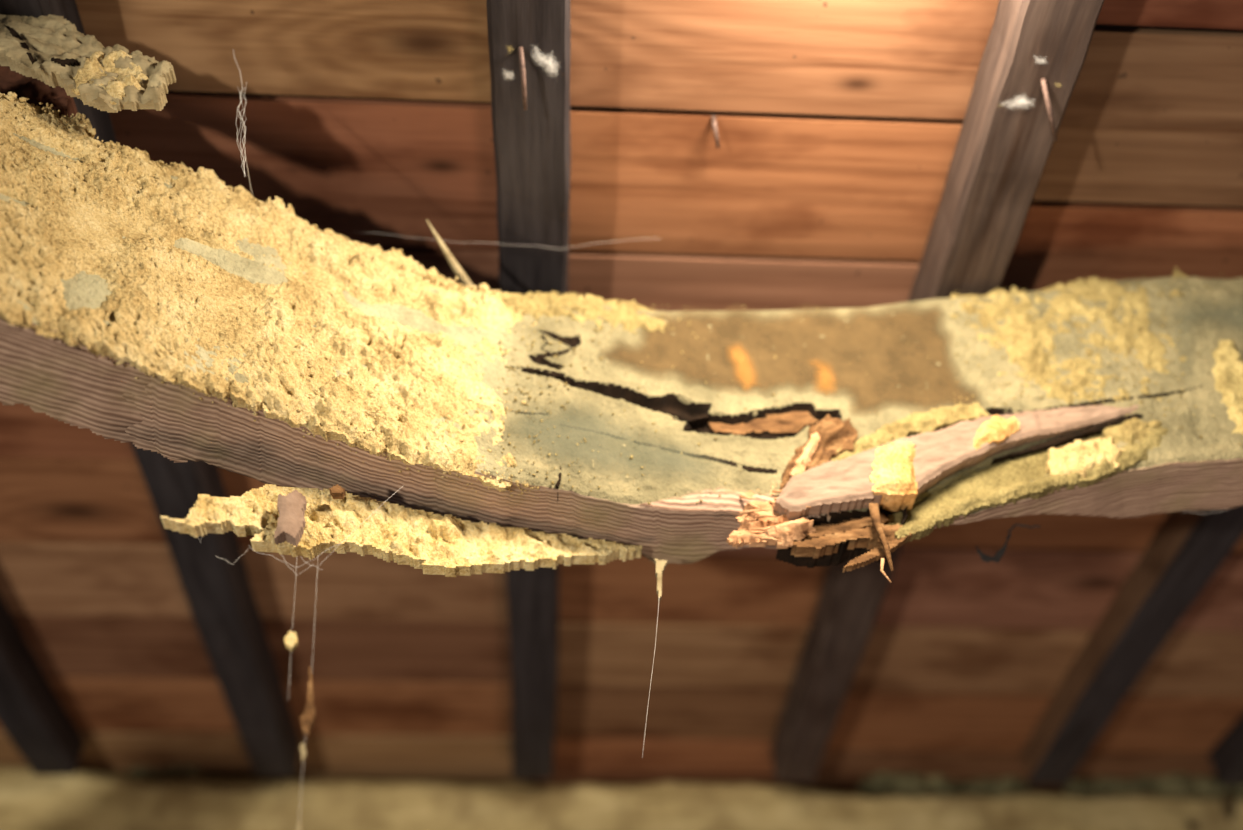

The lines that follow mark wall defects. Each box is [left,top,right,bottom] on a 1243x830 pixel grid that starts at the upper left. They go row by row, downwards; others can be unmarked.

leakage [607,309,976,411]
leakage [526,416,695,468]
crack [510,329,842,474]
crack [985,385,1202,465]
crack [554,465,562,503]
crack [776,506,907,568]